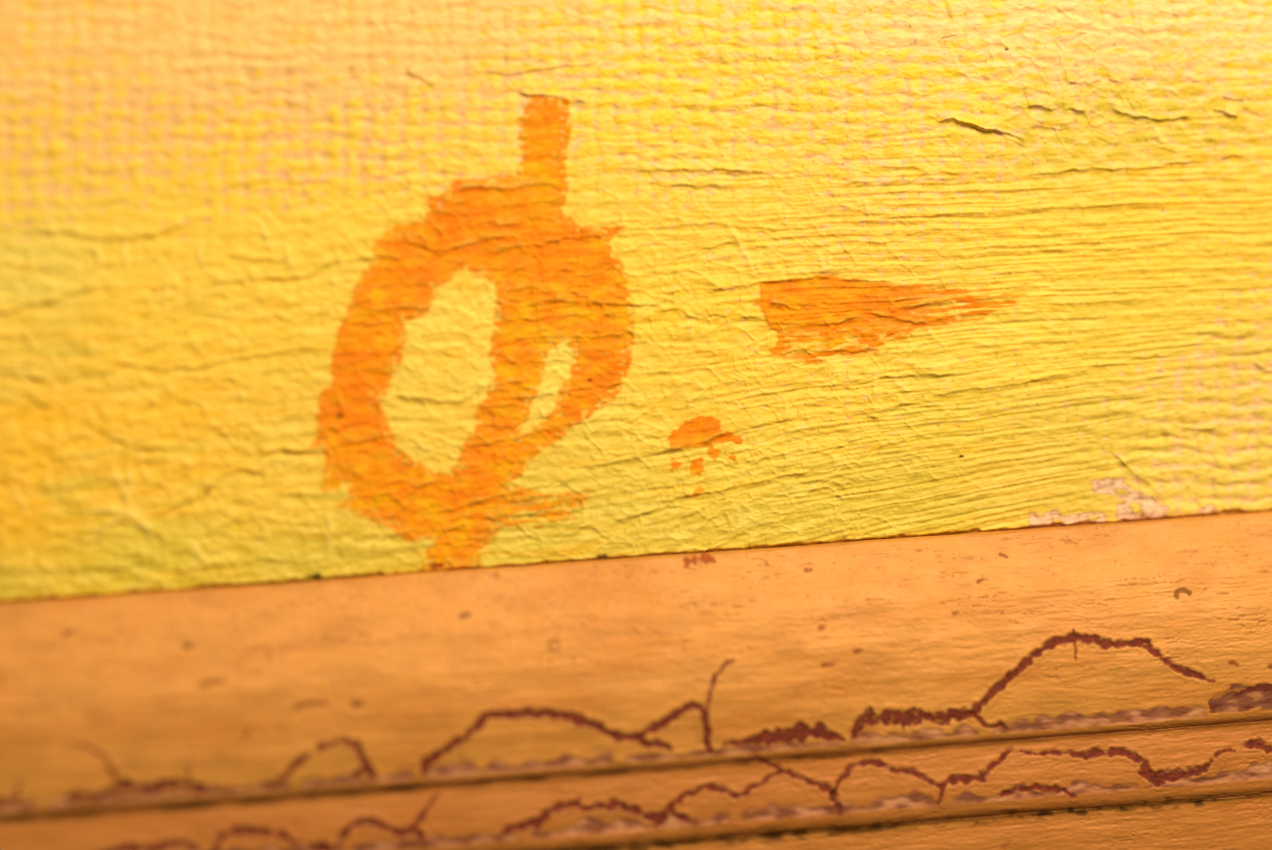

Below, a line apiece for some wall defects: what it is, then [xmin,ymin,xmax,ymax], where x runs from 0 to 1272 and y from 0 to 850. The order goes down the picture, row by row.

peeling [1028,478,1170,529]
crack [111,629,1272,850]
crack [65,743,209,801]